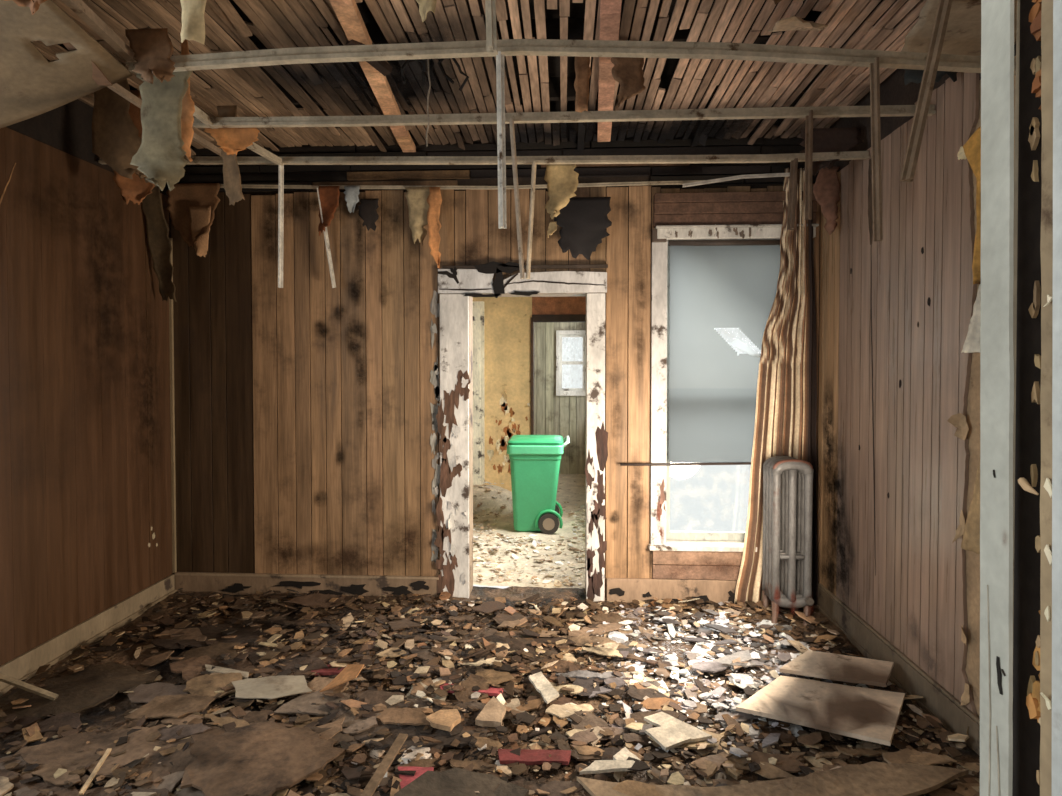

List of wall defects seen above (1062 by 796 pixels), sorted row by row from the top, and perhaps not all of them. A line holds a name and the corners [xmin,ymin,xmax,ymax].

peeling [382,290,470,597]
peeling [585,423,608,599]
damp [825,396,852,593]
flaking render [952,80,981,718]